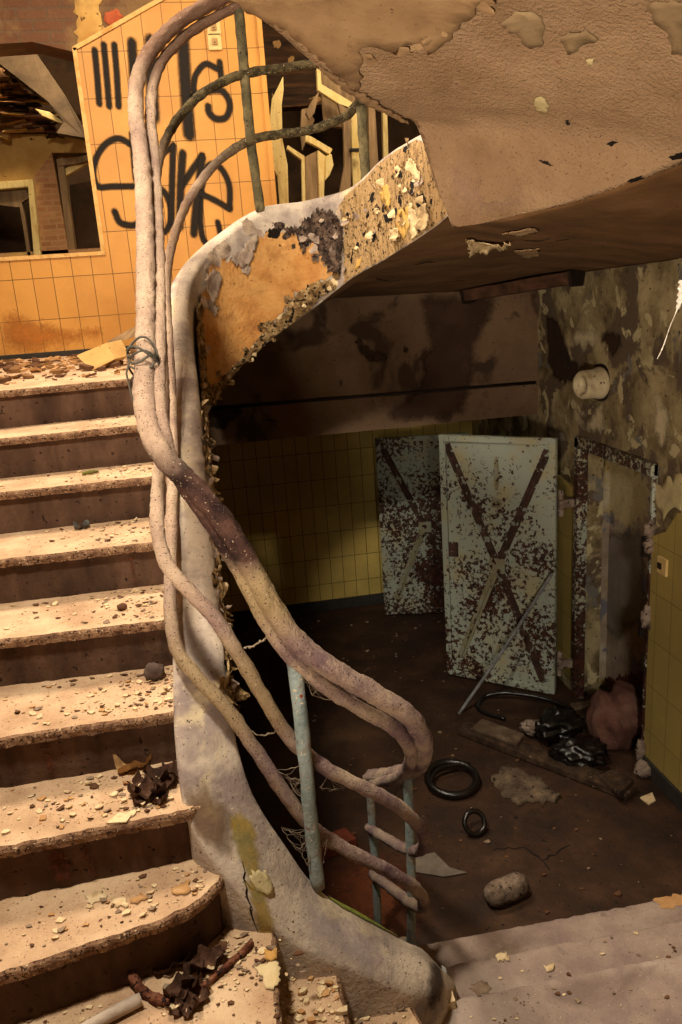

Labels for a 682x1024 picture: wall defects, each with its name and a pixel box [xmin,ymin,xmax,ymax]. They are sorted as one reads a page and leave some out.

peeling [229,0,545,125]
peeling [559,30,599,66]
peeling [466,228,540,259]
peeling [196,207,345,502]
damp [391,296,494,422]
damp [546,317,621,383]
damp [575,405,613,439]
damp [654,392,668,446]
peeling [208,537,234,628]
peeling [219,651,250,712]
damp [187,788,272,933]
crack [242,861,258,932]